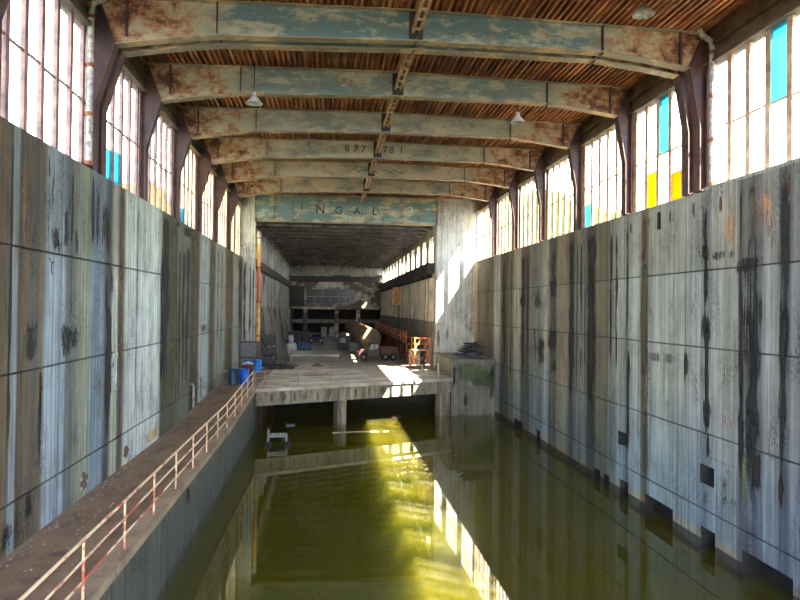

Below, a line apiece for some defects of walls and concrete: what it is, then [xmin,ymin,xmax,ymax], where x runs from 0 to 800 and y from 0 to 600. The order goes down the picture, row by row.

damp [61,319,81,356]
damp [159,219,254,400]
damp [568,237,597,402]
damp [701,191,763,497]
damp [778,185,791,508]